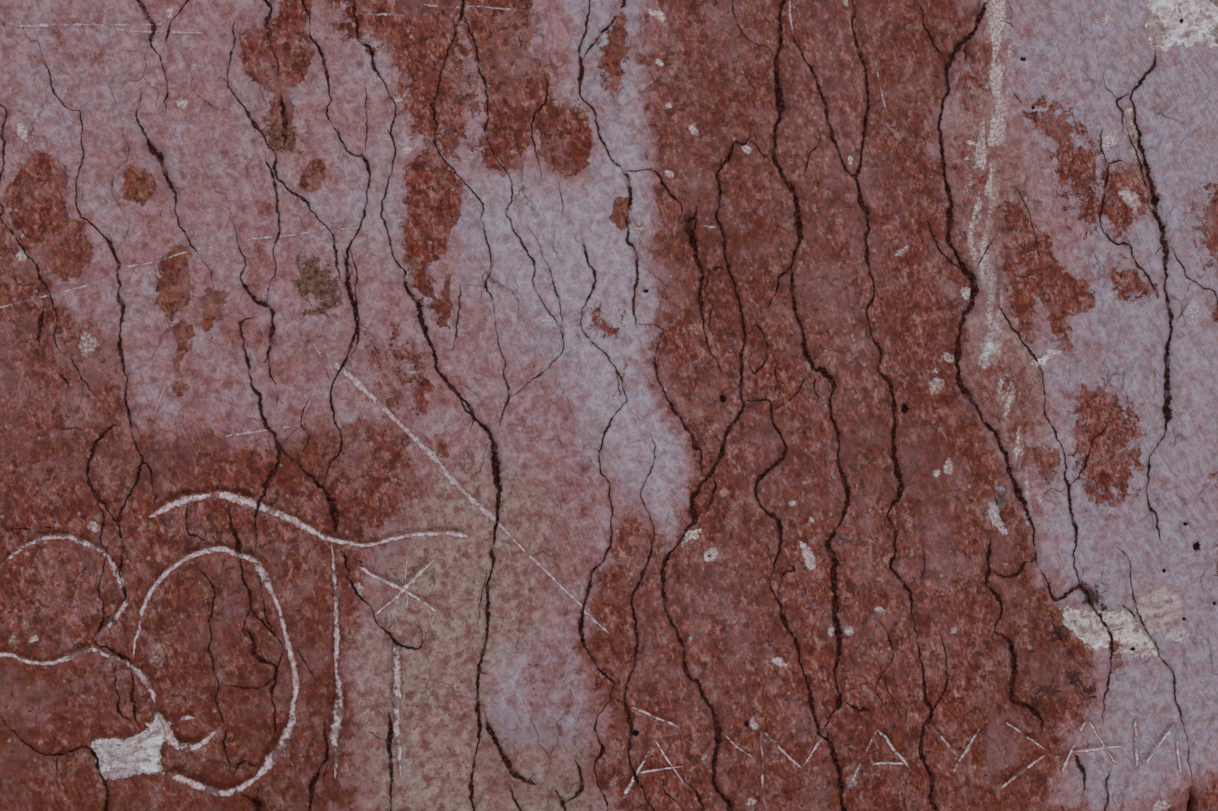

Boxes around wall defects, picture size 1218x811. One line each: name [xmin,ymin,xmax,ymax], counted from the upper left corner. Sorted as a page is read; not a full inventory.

spalling [1143,0,1218,54]
spalling [88,712,171,781]
crack [0,0,948,811]
crack [915,0,1193,811]
spalling [1060,569,1191,661]
crack [1099,52,1218,540]